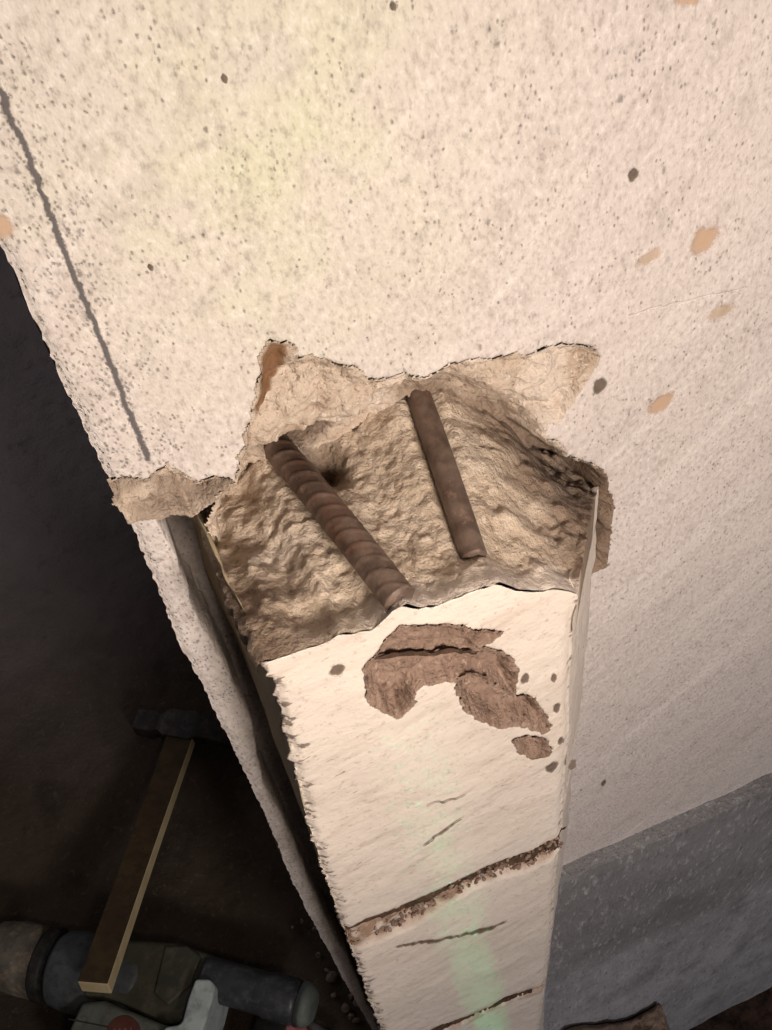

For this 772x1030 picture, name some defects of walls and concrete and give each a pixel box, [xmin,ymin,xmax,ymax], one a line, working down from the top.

corrosion [256,344,286,412]
spalling [107,340,615,610]
spalling [331,665,345,676]
spalling [362,623,576,773]
crack [345,826,567,948]
crack [431,985,542,1030]